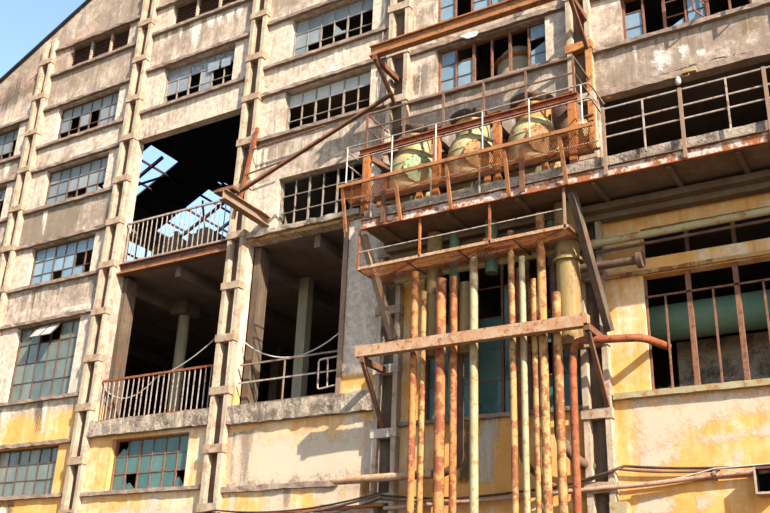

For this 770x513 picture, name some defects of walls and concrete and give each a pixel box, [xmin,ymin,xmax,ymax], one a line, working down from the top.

water stain [35,401,49,433]
peeling [633,386,770,470]